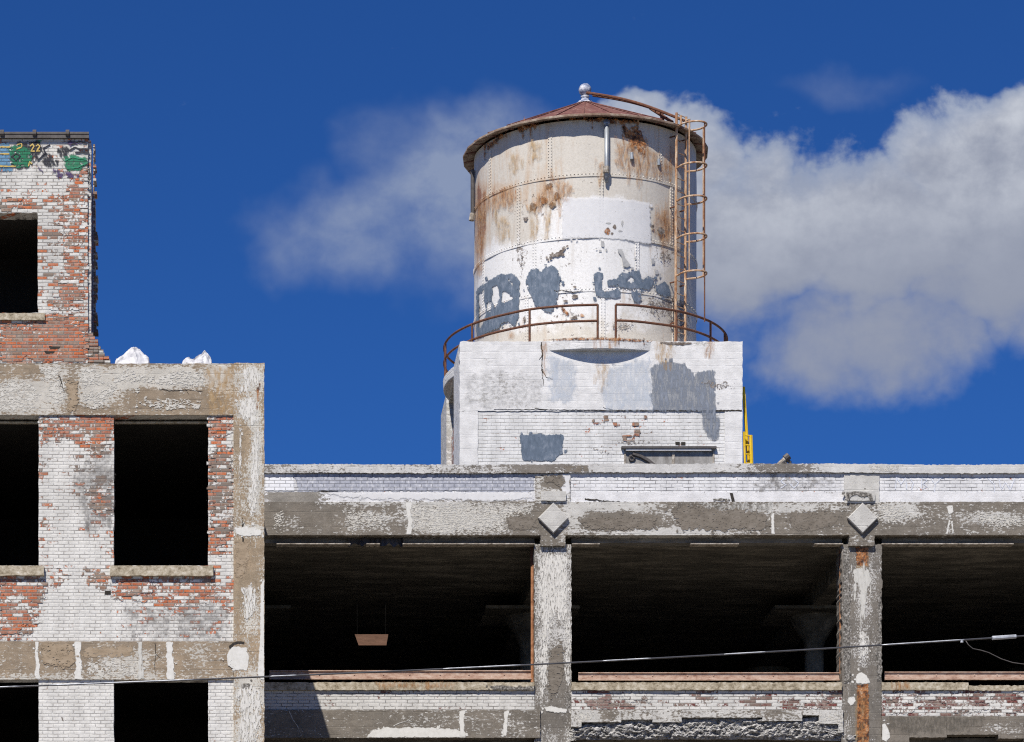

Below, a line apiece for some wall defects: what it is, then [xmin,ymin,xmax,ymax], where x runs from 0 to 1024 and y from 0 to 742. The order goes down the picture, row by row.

corrosion [483,119,539,159]
corrosion [523,175,572,235]
corrosion [570,117,671,189]
flaking render [0,168,116,457]
crack [494,342,742,412]
flaking render [592,415,660,445]
flaking render [128,365,288,742]
flaking render [0,566,221,679]
spalling [486,549,856,741]
flaking render [843,546,1024,742]